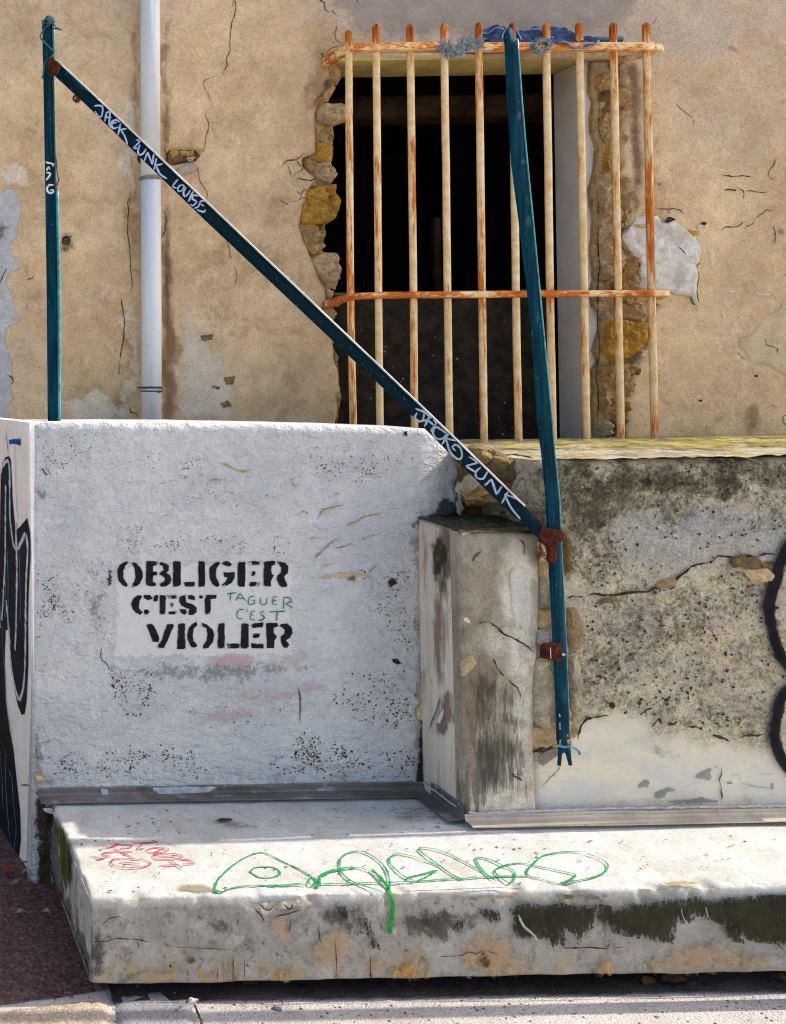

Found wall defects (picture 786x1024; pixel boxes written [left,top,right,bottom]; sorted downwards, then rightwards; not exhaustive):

peeling [0,163,21,418]
crack [197,0,236,200]
flaking render [299,65,345,325]
flaking render [594,63,716,438]
crack [721,159,776,244]
crack [478,621,532,651]
crack [566,553,778,599]
water stain [479,734,524,795]